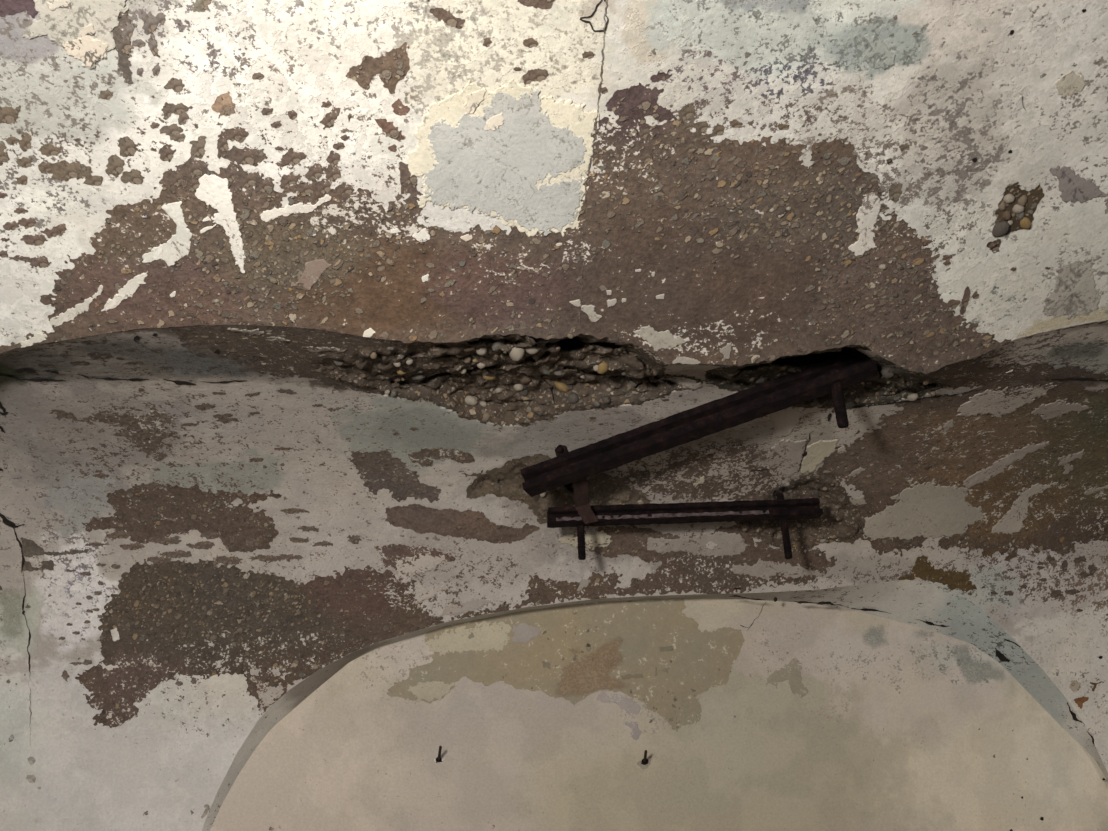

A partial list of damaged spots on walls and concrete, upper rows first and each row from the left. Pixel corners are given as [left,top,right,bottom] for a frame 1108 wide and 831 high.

peeling [112,11,166,85]
peeling [192,0,211,12]
peeling [346,42,410,116]
peeling [427,0,465,29]
peeling [523,38,538,48]
peeling [518,0,554,9]
crack [578,0,608,326]
crack [0,369,247,433]
peeling [0,68,1108,732]
crack [0,513,32,745]
peeling [26,756,41,790]